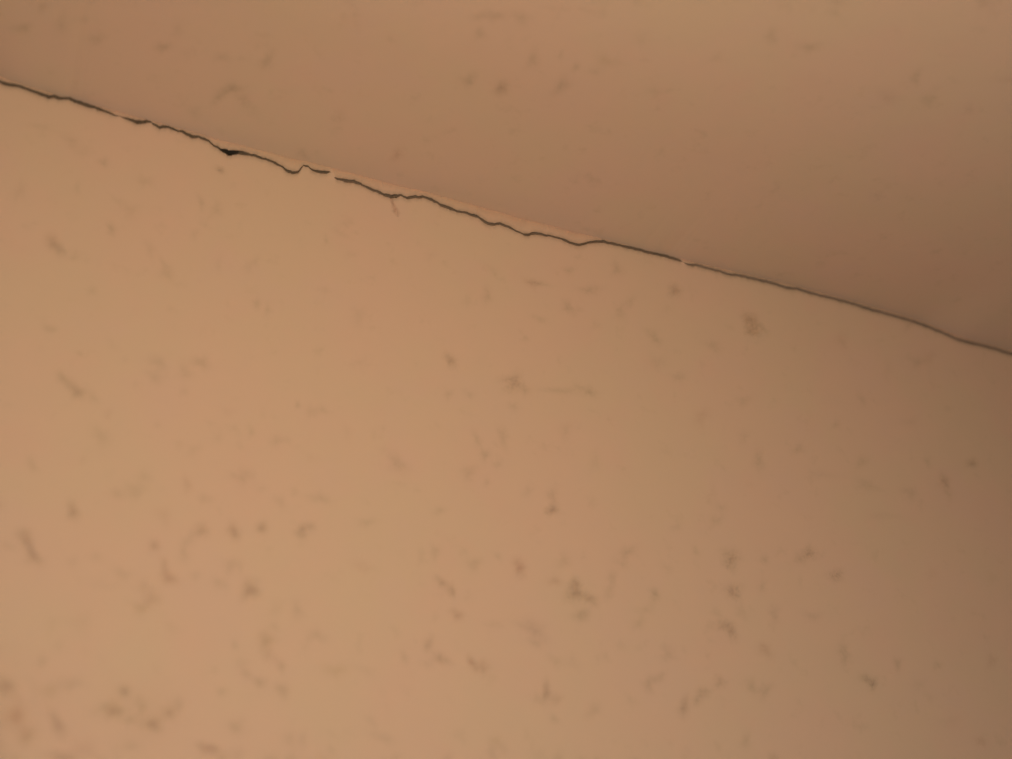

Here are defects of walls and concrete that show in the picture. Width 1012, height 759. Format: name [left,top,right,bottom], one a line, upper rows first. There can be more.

crack [0,80,1012,355]